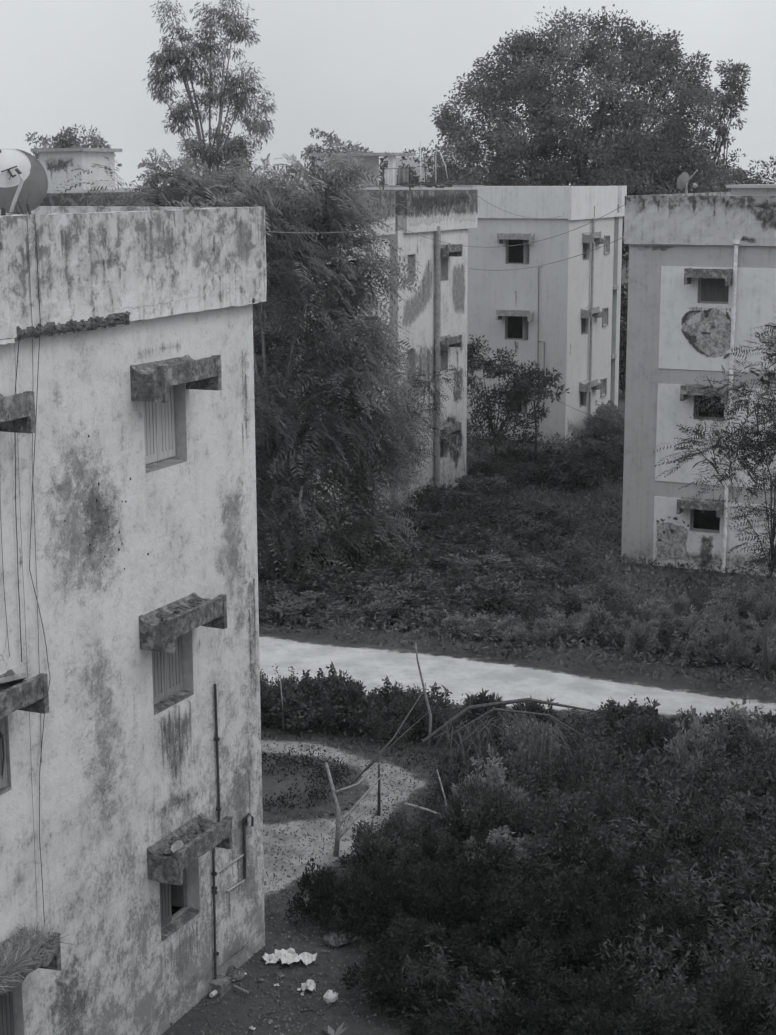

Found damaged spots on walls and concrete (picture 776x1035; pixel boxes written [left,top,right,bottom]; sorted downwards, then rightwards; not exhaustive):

water stain [22,229,40,268]
water stain [61,226,72,291]
water stain [89,223,123,279]
flaking render [681,308,731,359]
peeling [656,517,689,561]
water stain [162,711,191,776]